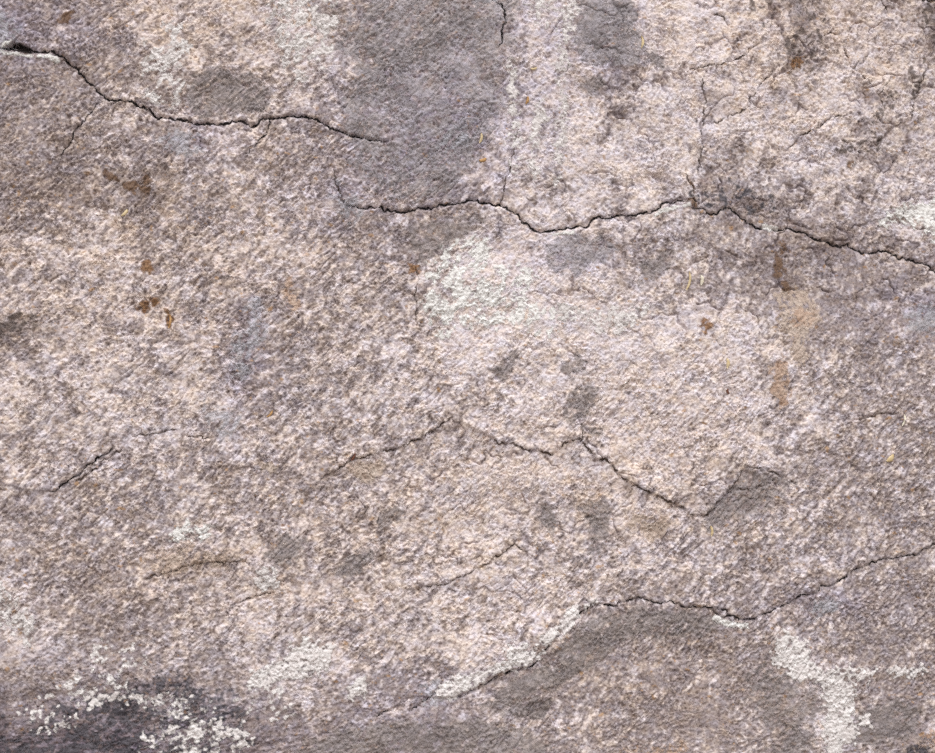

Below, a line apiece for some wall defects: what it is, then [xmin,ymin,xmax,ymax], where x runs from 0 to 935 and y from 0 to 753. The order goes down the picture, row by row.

crack [492,0,507,46]
crack [0,44,393,156]
crack [333,31,935,273]
crack [319,416,454,482]
crack [495,424,794,516]
crack [377,543,935,717]
leakage [0,670,265,753]